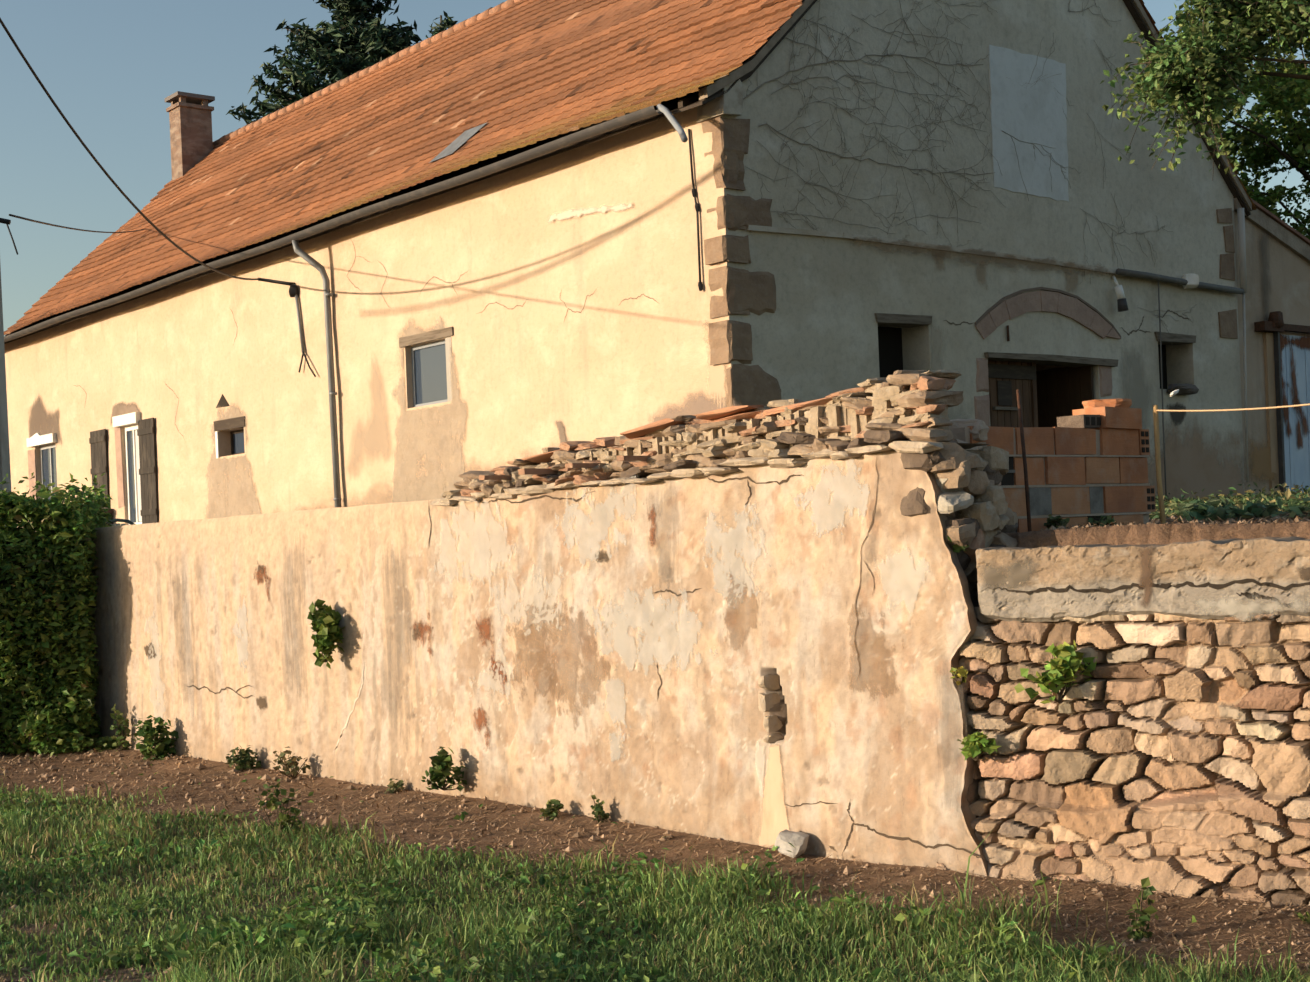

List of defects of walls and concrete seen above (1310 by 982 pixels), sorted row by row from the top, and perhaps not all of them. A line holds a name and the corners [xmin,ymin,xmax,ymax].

crack [347,240,392,309]
crack [420,272,528,314]
crack [560,287,660,321]
rust [1280,334,1310,448]
rust [254,567,270,600]
crack [854,457,878,681]
crack [189,685,253,699]
spalling [758,674,784,743]
crack [785,799,984,858]